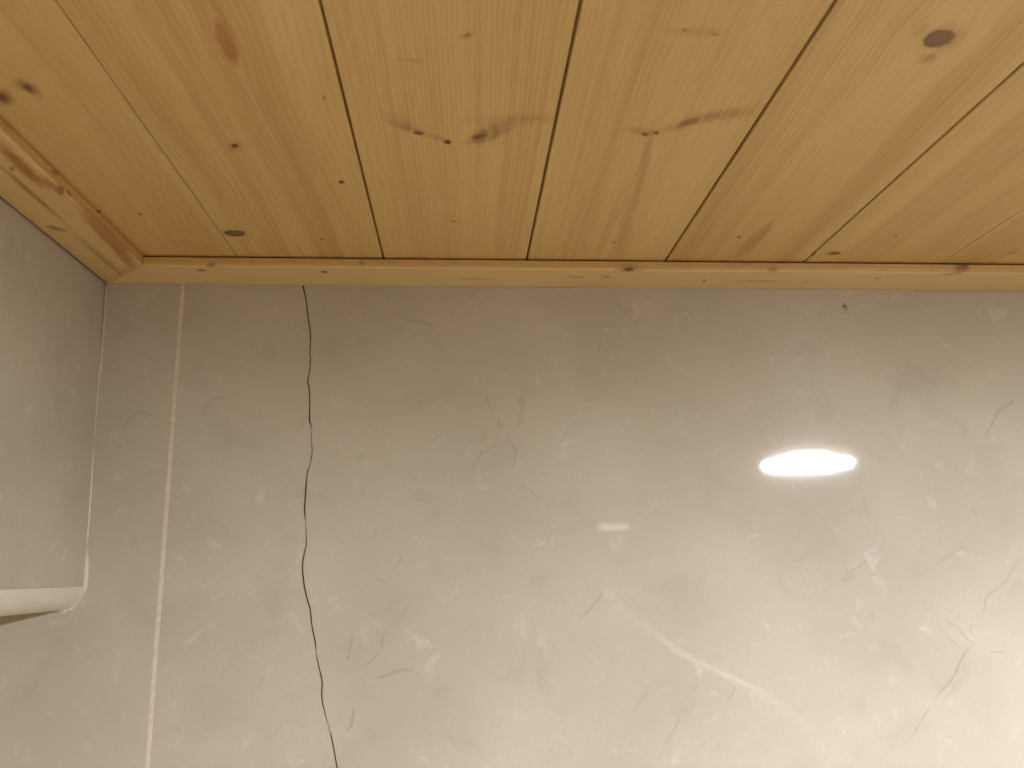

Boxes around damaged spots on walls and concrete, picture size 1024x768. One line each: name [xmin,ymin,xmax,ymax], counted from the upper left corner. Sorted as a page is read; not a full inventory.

crack [302,286,338,768]